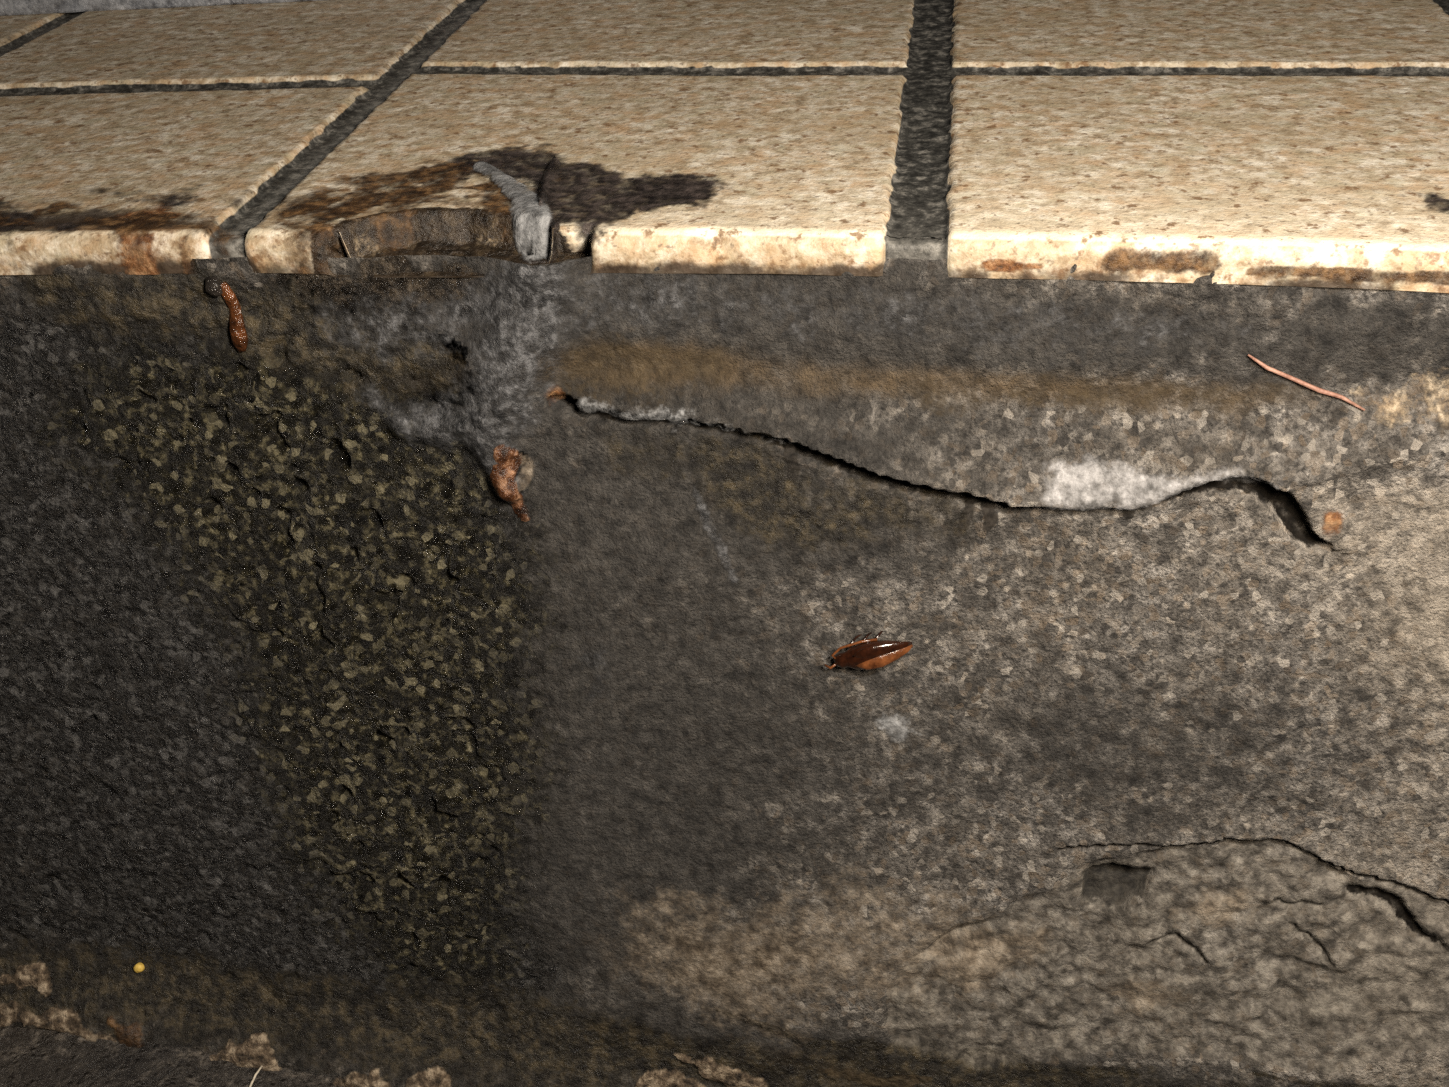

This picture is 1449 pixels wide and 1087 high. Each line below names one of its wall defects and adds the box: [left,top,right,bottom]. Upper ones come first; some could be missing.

water stain [0,266,1398,1087]
crack [577,398,1324,548]